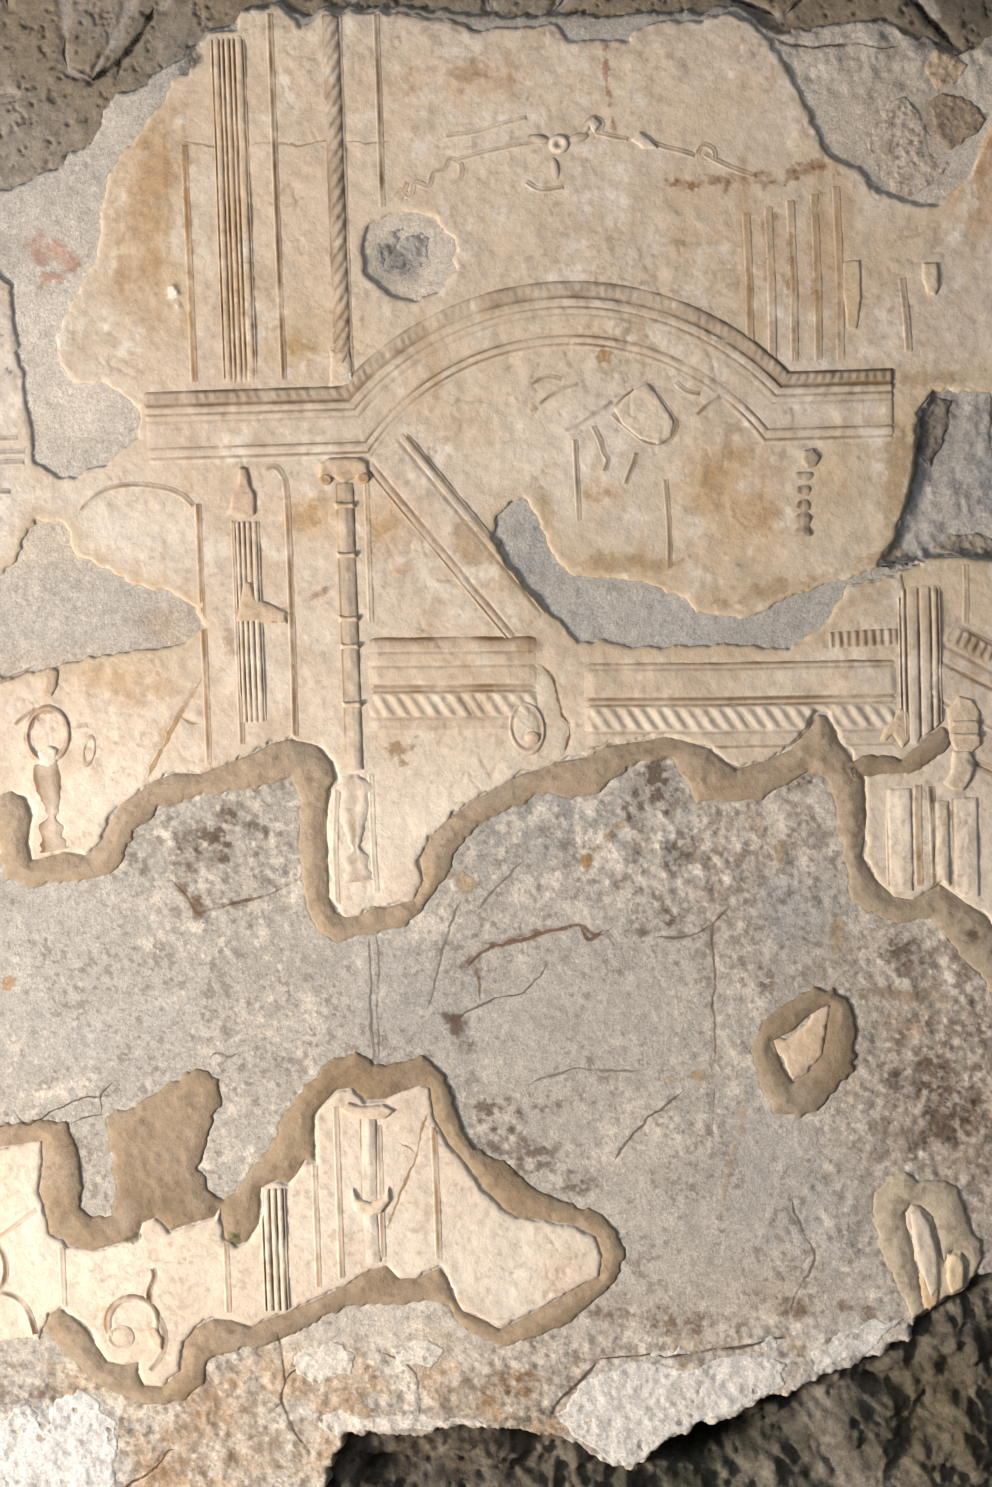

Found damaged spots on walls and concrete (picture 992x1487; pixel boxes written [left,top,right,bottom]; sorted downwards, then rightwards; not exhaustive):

crack [62,8,154,82]
crack [732,0,898,49]
spalling [707,5,992,206]
crack [915,3,969,56]
spalling [494,389,992,649]
spalling [0,519,205,677]
spalling [319,747,338,804]
crack [976,761,992,774]
crack [427,862,614,1016]
spalling [0,758,992,1487]